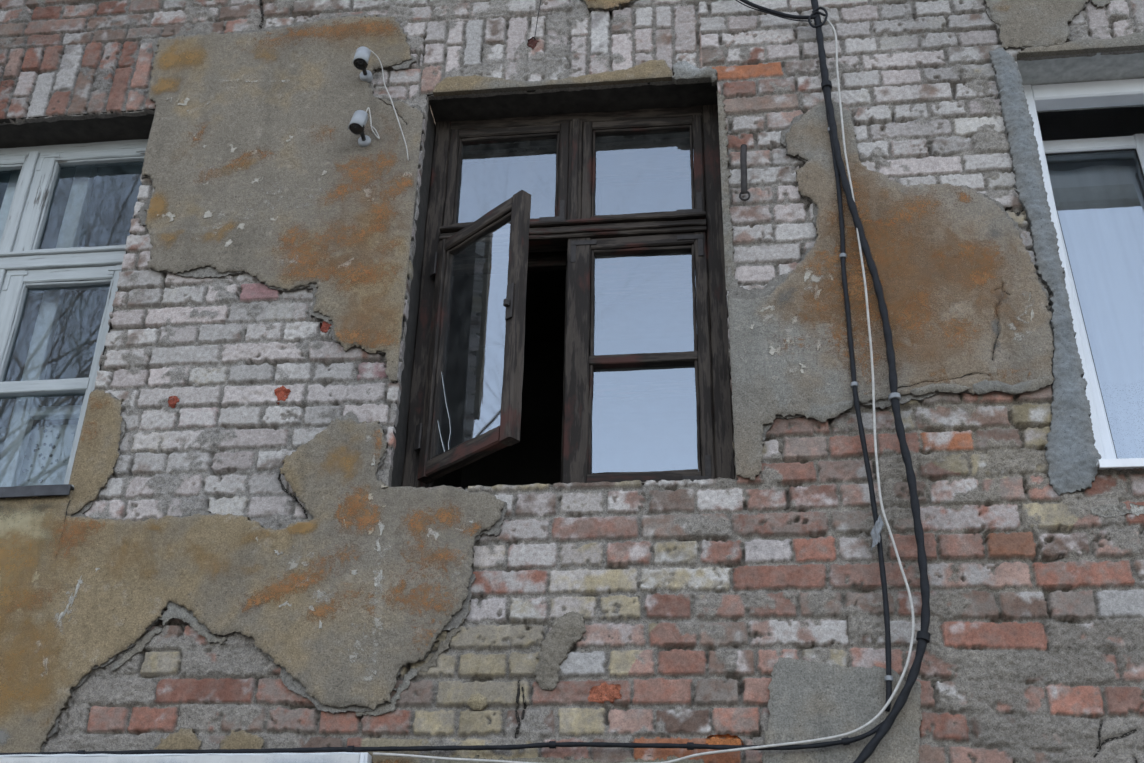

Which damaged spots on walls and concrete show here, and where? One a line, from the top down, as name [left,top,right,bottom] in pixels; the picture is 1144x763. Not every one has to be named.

flaking render [580,0,638,13]
flaking render [984,0,1144,59]
flaking render [432,59,673,97]
flaking render [137,13,423,383]
flaking render [726,100,1055,481]
spalling [274,386,291,405]
flaking render [0,389,507,753]
spalling [588,682,622,704]
spalling [706,734,744,745]
crack [1093,724,1138,763]